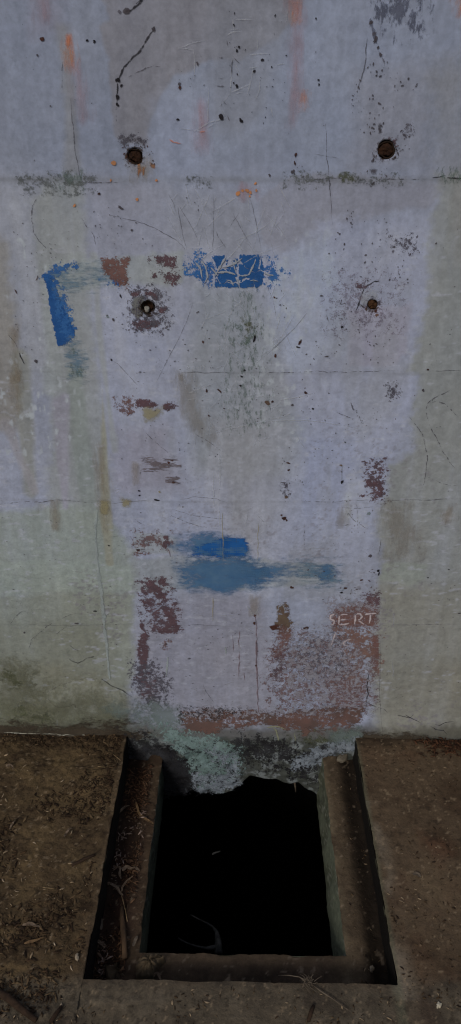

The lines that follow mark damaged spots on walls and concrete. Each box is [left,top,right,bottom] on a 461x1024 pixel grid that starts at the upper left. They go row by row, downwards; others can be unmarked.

leakage [0,702,442,801]
spalling [75,742,398,985]